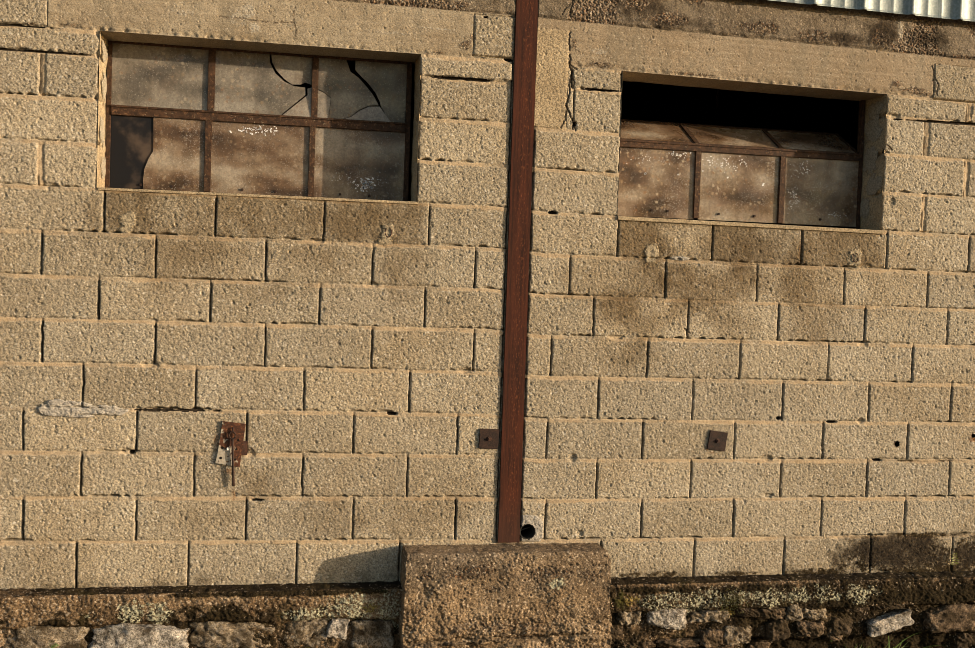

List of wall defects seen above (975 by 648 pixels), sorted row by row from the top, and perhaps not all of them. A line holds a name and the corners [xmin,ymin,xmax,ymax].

crack [560,0,577,131]
leakage [783,531,975,575]